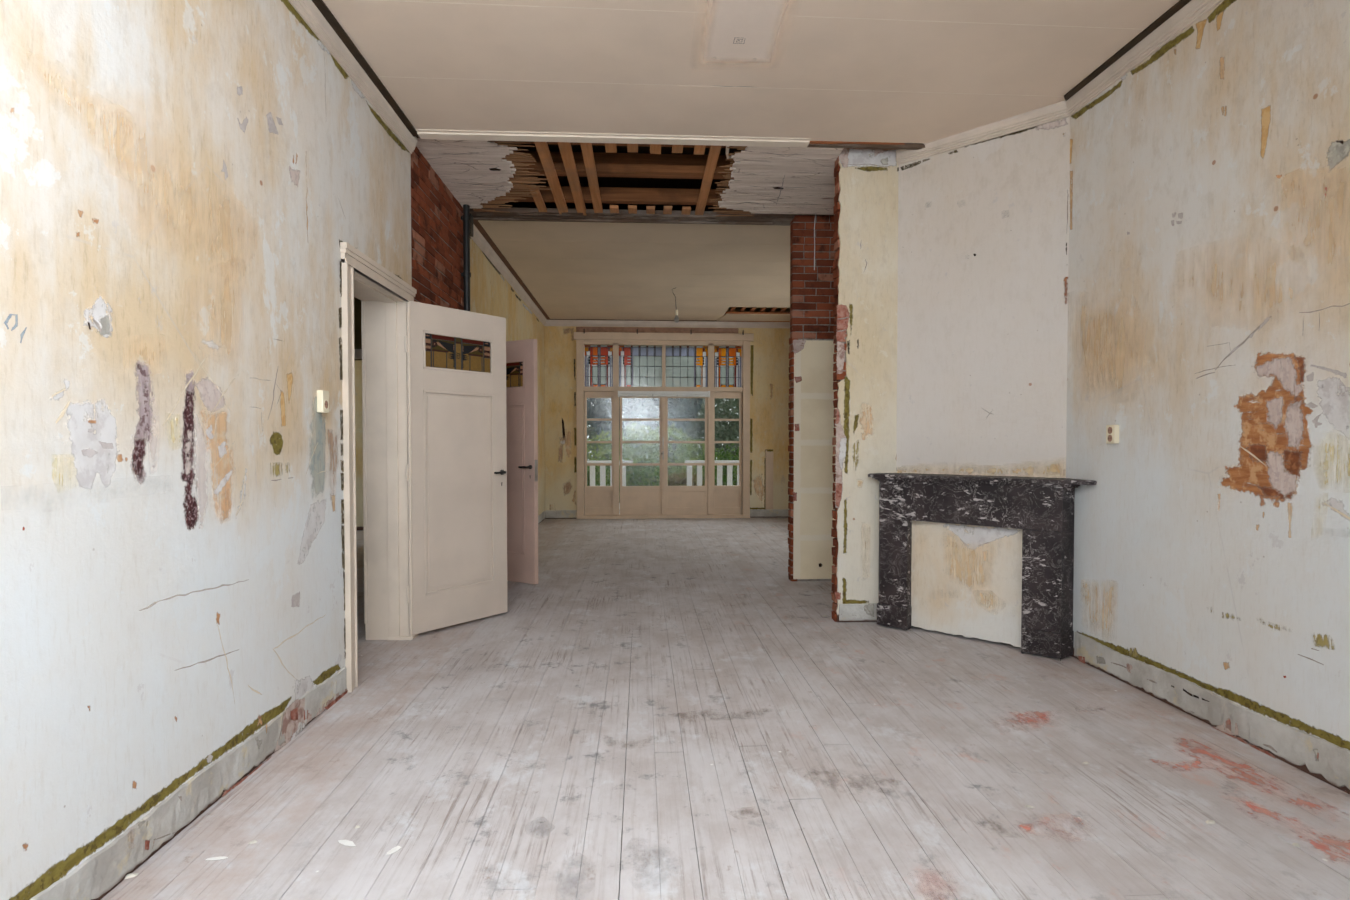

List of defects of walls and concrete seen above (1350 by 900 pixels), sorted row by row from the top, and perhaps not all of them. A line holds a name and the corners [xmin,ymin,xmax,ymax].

spalling [1327,140,1350,169]
peeling [84,296,113,338]
spalling [836,305,849,374]
water stain [256,369,293,426]
peeling [1305,365,1350,439]
peeling [51,380,118,489]
peeling [298,500,326,564]
crack [139,579,249,611]
crack [177,622,237,702]
water stain [1298,634,1334,665]